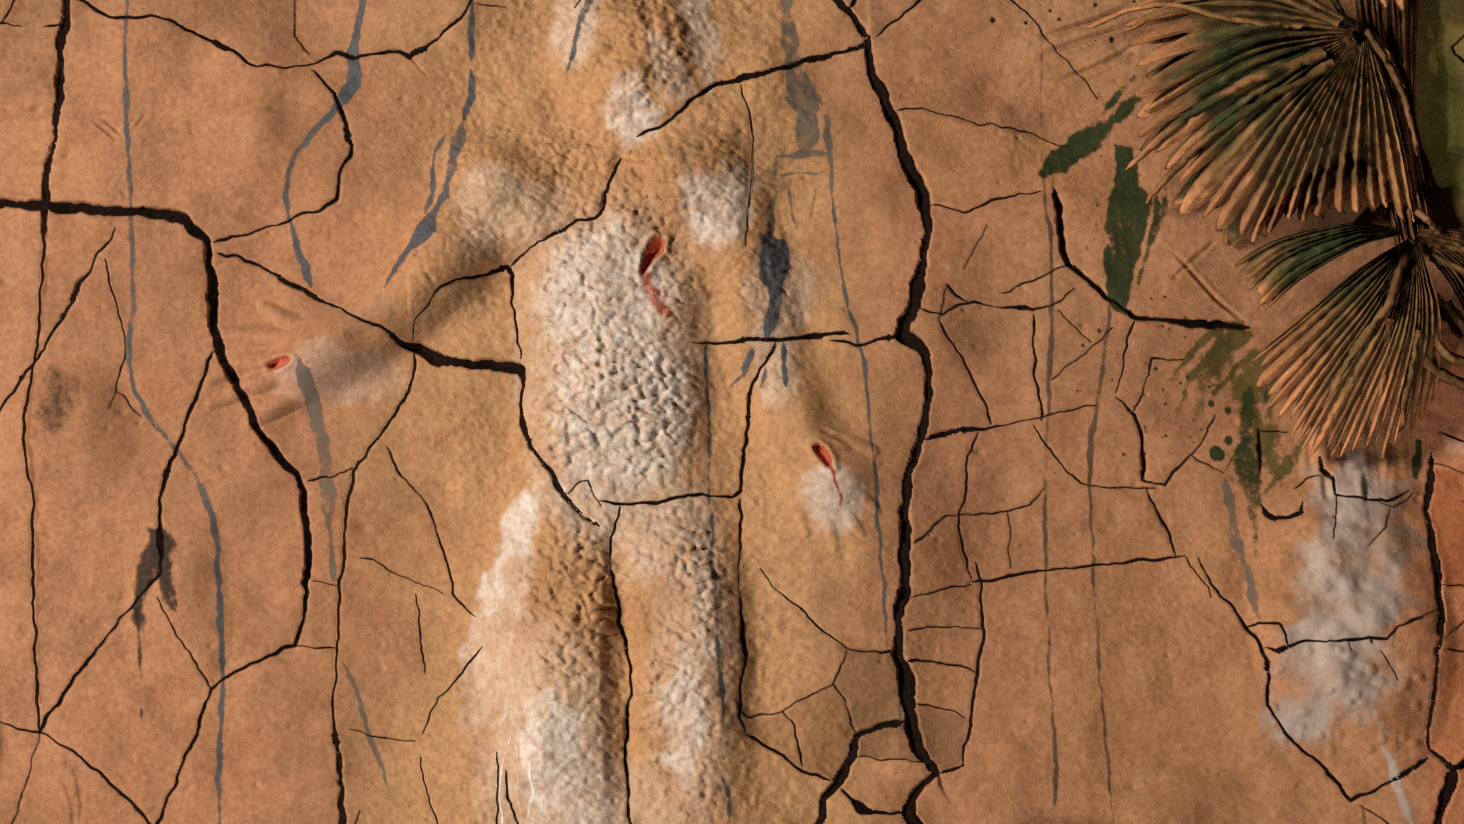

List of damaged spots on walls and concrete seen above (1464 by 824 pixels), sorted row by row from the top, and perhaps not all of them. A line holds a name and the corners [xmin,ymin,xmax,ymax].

leakage [282,0,366,287]
leakage [384,0,476,288]
crack [0,0,850,824]
crack [637,0,1464,824]
leakage [1222,437,1258,610]
leakage [1273,453,1399,738]
leakage [1383,741,1413,824]